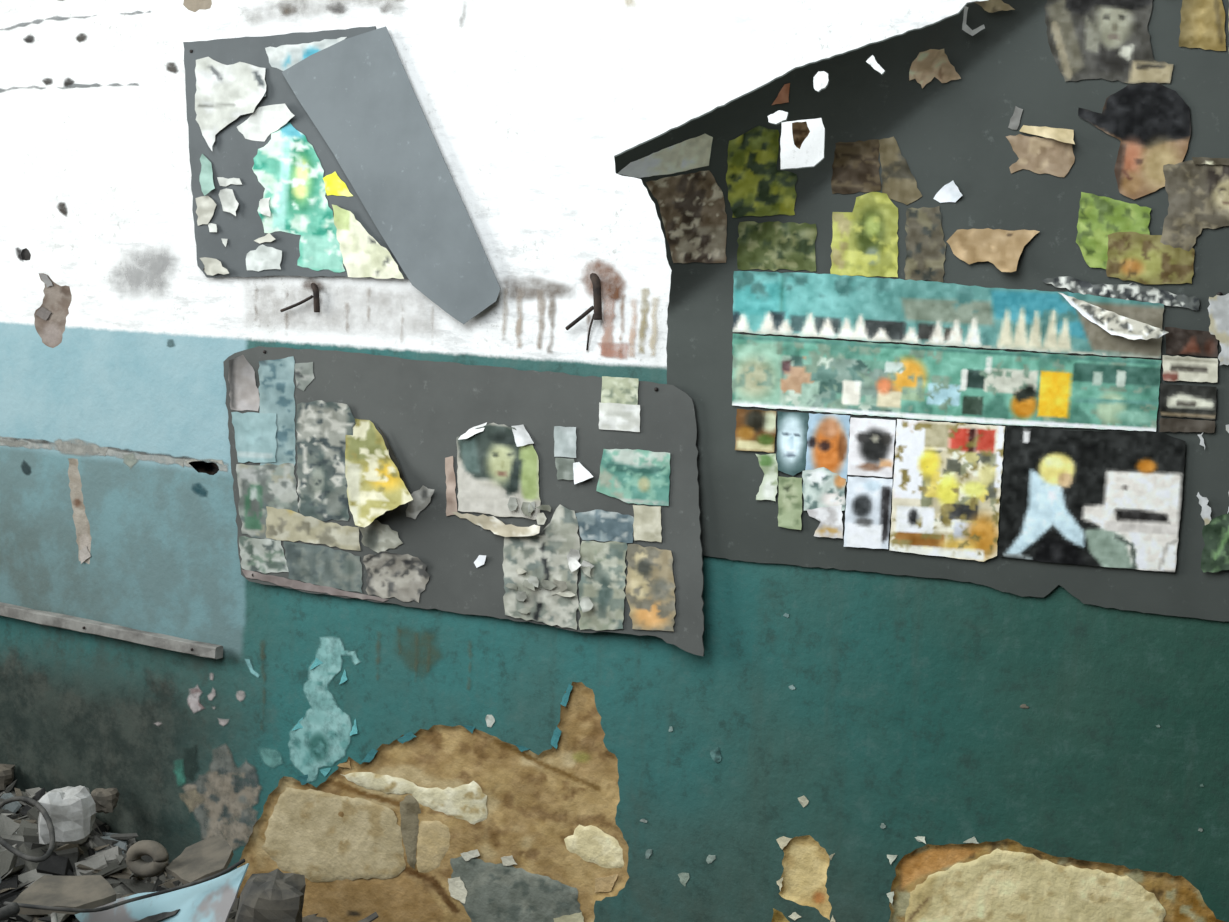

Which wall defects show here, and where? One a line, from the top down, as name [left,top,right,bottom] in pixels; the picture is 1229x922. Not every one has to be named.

flaking render [16,248,31,261]
flaking render [34,273,72,348]
flaking render [174,637,629,922]
flaking render [771,835,835,922]
flaking render [887,836,1225,922]